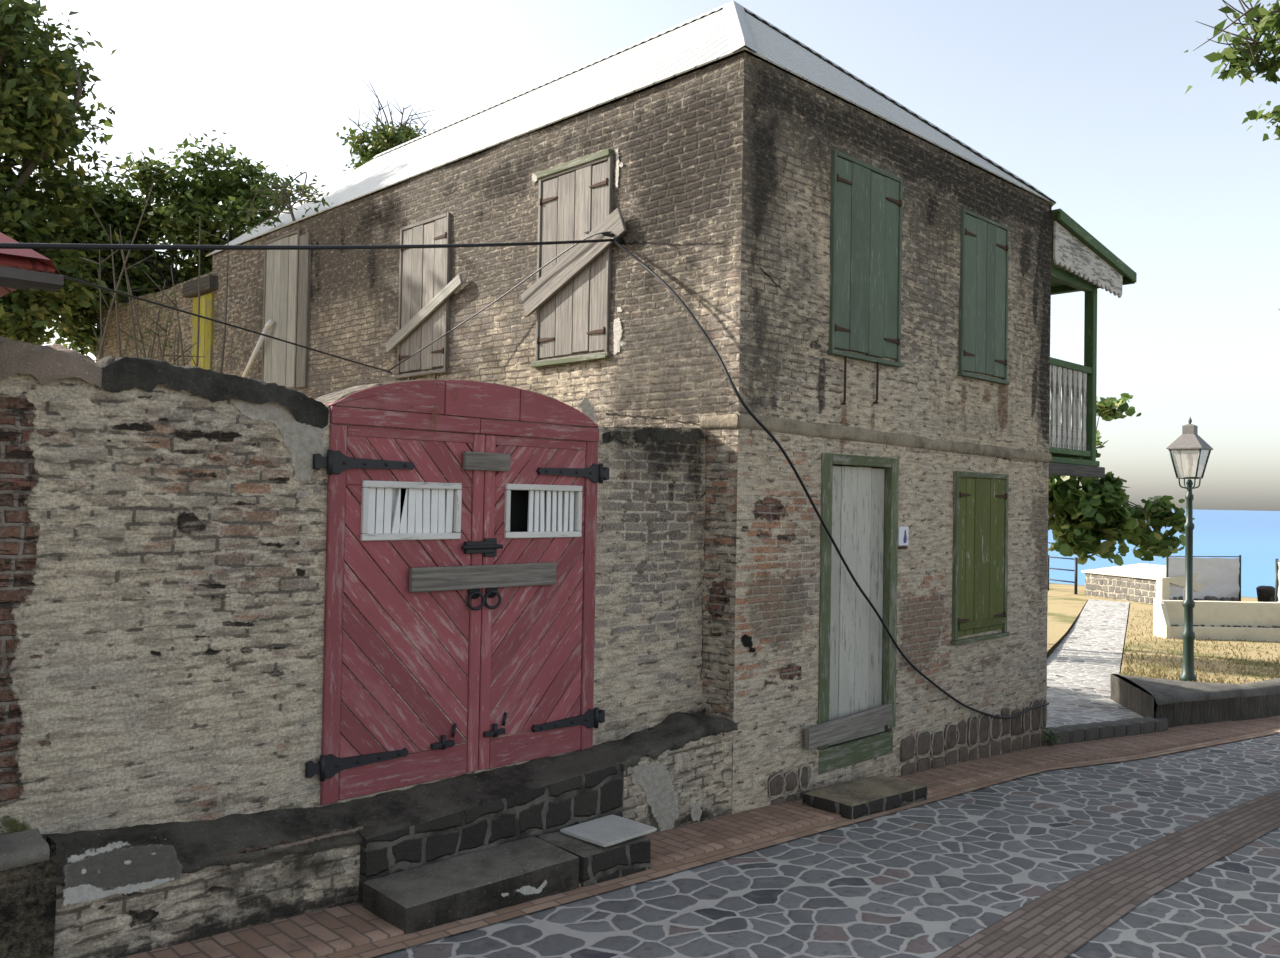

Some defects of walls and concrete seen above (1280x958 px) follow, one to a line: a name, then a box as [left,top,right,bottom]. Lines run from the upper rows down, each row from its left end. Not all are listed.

water stain [340,200,397,287]
water stain [443,70,1052,444]
spalling [741,494,796,542]
spalling [0,391,58,808]
spalling [707,578,730,637]
spalling [741,634,756,652]
spalling [764,664,802,690]
flaking render [631,750,702,831]
peeling [63,841,174,928]